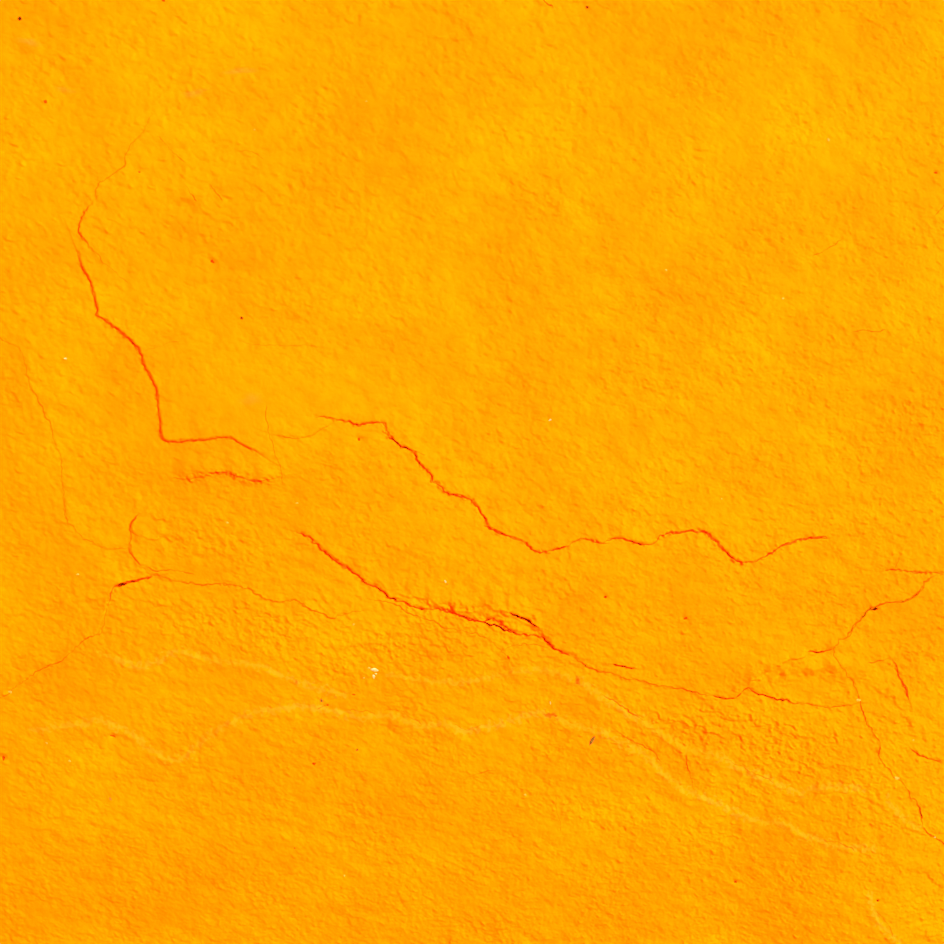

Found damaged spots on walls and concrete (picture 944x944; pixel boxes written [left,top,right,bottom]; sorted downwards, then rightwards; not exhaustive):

crack [77,116,843,563]
crack [0,341,944,844]